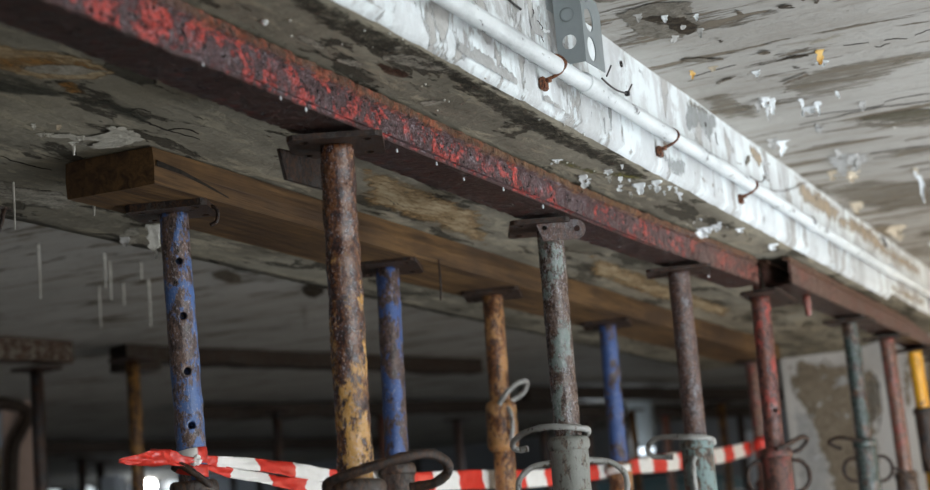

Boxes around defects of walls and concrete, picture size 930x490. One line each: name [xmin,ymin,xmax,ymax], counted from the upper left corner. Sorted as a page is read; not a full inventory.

spalling [293,0,474,85]
spalling [616,2,704,43]
rust [377,63,409,78]
peeling [458,43,518,85]
peeling [31,123,145,149]
peeling [755,96,776,121]
peeling [798,98,824,133]
peeling [550,159,683,201]
peeling [912,167,926,203]
peeling [686,218,745,238]
spalling [789,358,859,490]
spalling [864,370,883,472]